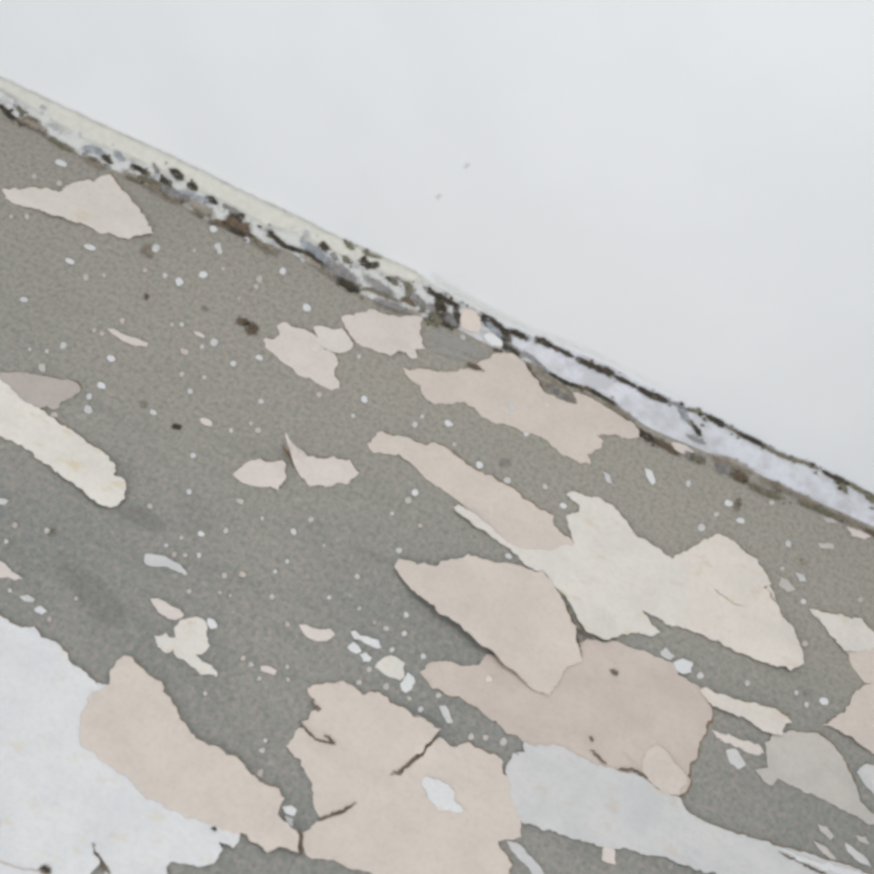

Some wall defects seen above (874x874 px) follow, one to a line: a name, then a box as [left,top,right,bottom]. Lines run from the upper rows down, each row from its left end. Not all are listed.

peeling [2,173,153,240]
leakage [0,79,468,331]
leakage [236,317,259,334]
peeling [263,308,639,464]
peeling [0,371,127,508]
leakage [480,312,874,536]
peeling [0,430,874,874]
crack [299,701,335,745]
crack [393,736,437,774]
crack [295,830,303,855]
crack [320,803,355,819]